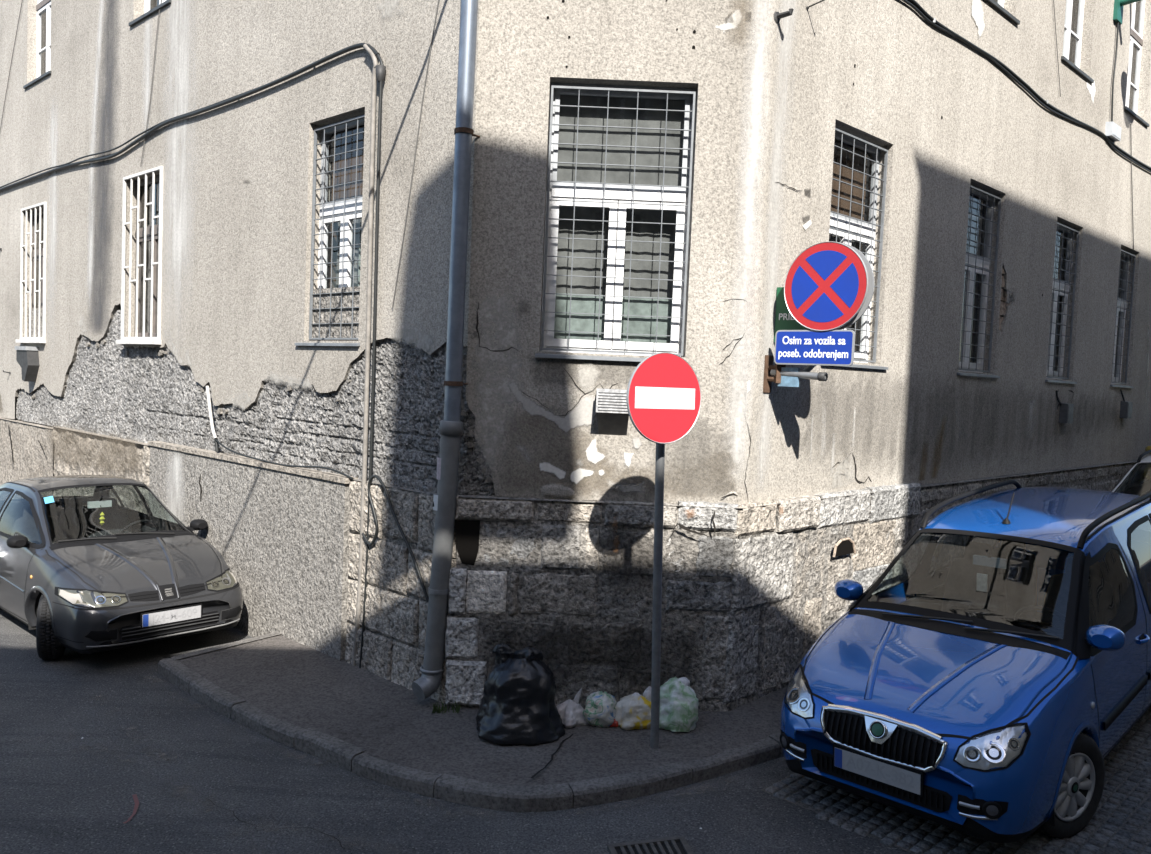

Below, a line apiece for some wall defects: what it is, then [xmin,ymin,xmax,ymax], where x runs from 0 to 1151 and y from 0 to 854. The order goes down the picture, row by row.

damp [89,0,114,328]
flaking render [0,286,446,493]
flaking render [457,346,495,496]
flaking render [507,366,598,432]
flaking render [518,438,644,492]